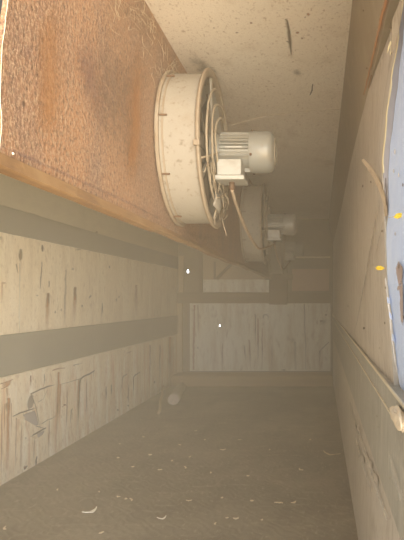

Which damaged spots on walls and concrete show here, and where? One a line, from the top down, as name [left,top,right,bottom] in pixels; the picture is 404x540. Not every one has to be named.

spalling [396,262,404,323]
peeling [13,385,53,440]